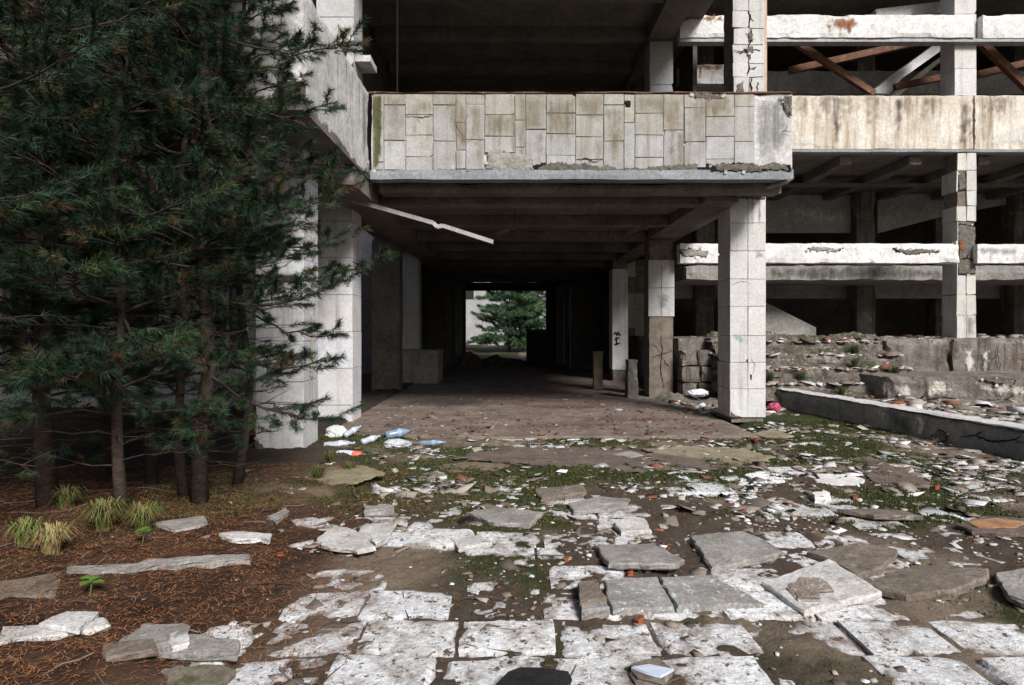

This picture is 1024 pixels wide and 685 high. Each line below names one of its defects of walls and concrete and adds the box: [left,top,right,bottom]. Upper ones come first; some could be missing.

rust [828,18,856,33]
crack [734,11,761,91]
damp [352,74,381,155]
spalling [484,149,792,174]
peeling [679,247,711,258]
peeling [892,247,941,255]
spalling [958,223,976,276]
crack [958,429,1024,444]